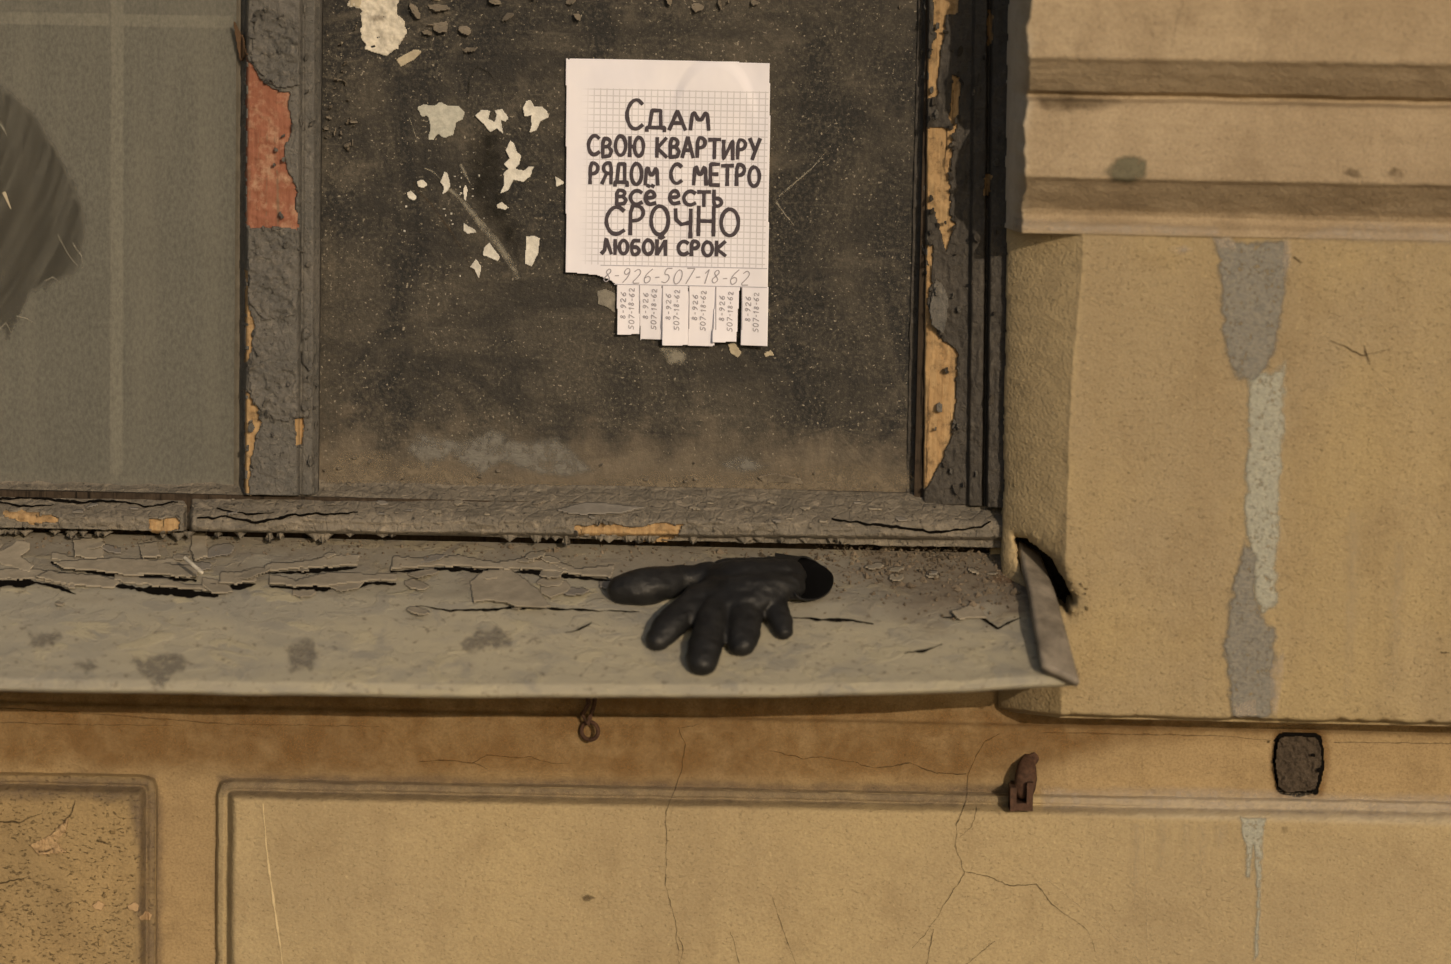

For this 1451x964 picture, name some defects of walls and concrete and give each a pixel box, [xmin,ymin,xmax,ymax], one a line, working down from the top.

peeling [397,0,478,67]
peeling [489,0,514,22]
peeling [234,0,361,267]
peeling [920,0,978,508]
peeling [0,503,272,594]
peeling [470,550,612,610]
flaking render [1016,537,1089,613]
crack [779,734,1095,963]